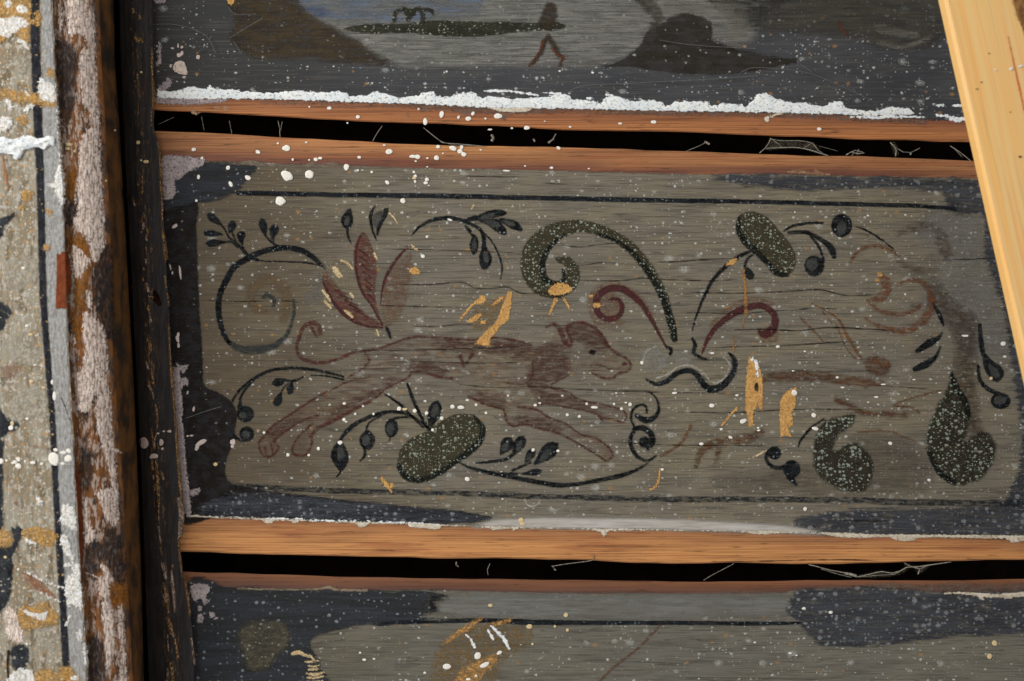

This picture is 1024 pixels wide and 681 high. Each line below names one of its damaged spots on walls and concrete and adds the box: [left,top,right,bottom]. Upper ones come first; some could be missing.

damp [370,89,965,124]
peeling [0,0,130,681]
peeling [239,621,324,681]
peeling [431,594,790,681]